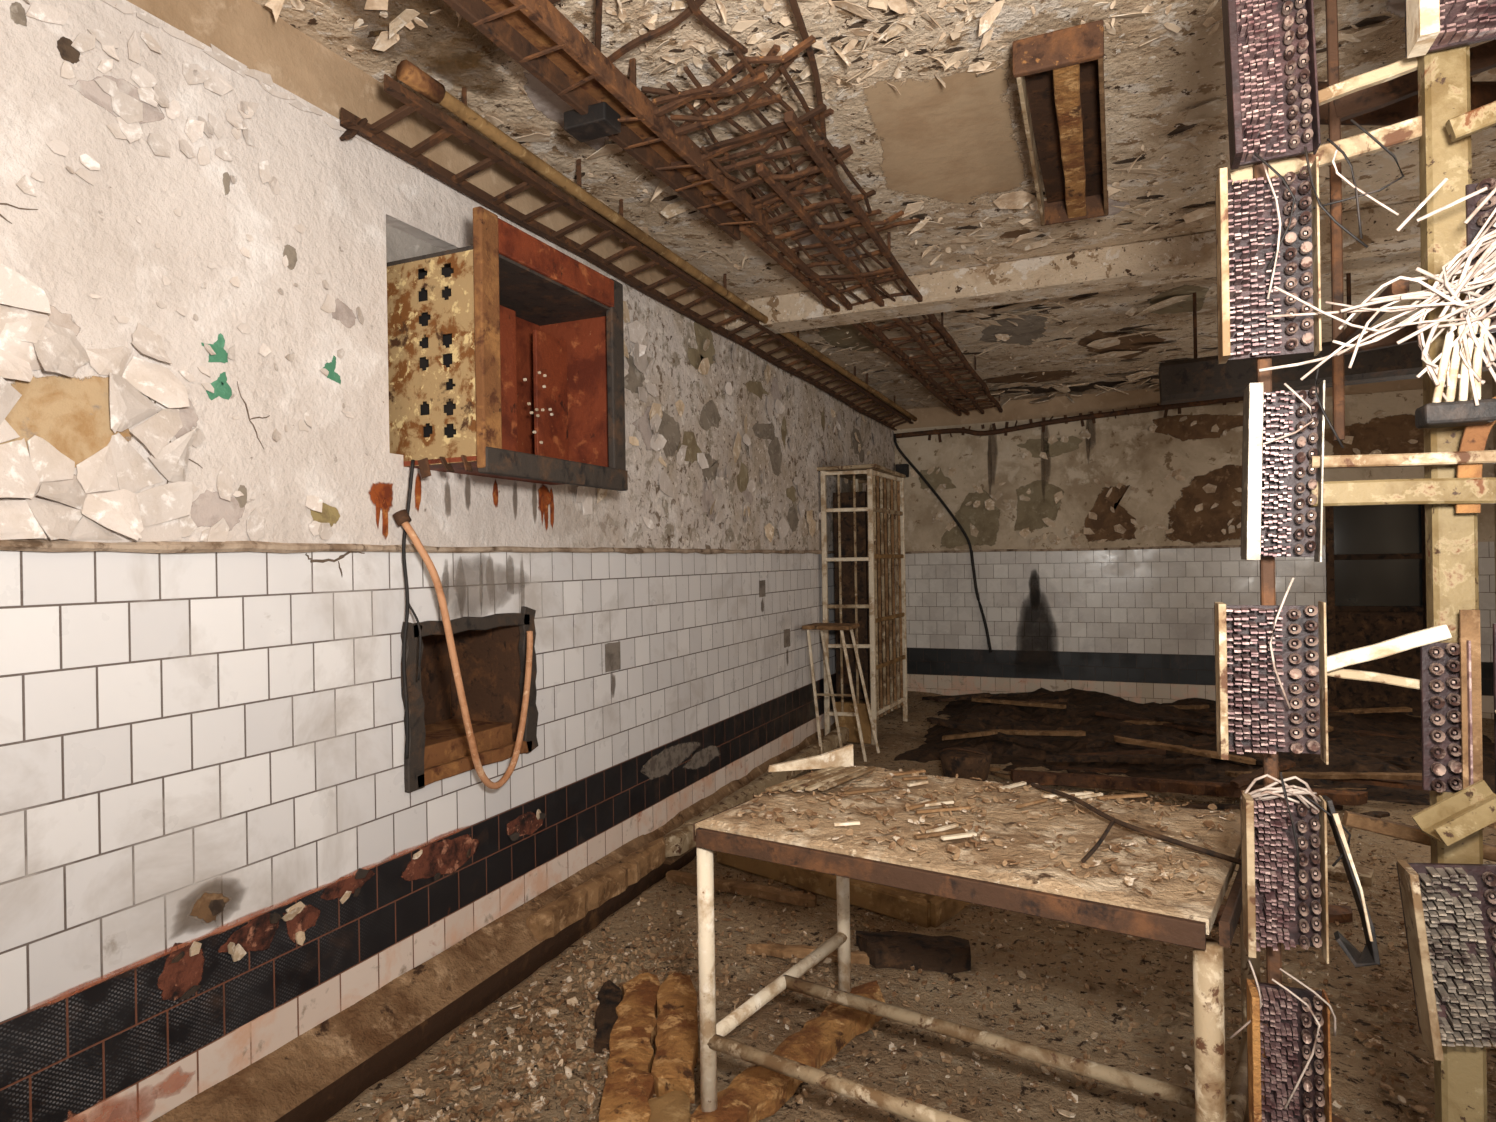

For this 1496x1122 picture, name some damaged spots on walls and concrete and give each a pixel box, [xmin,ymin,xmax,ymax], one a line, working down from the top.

peeling [265,0,462,52]
peeling [10,0,428,197]
peeling [584,0,1228,283]
crack [0,203,38,224]
peeling [0,262,294,542]
rust [369,482,393,539]
rust [445,477,470,512]
rust [493,479,554,530]
spalling [910,464,1242,550]
water stain [443,559,524,616]
spalling [157,868,376,1001]
rust [69,1071,190,1122]